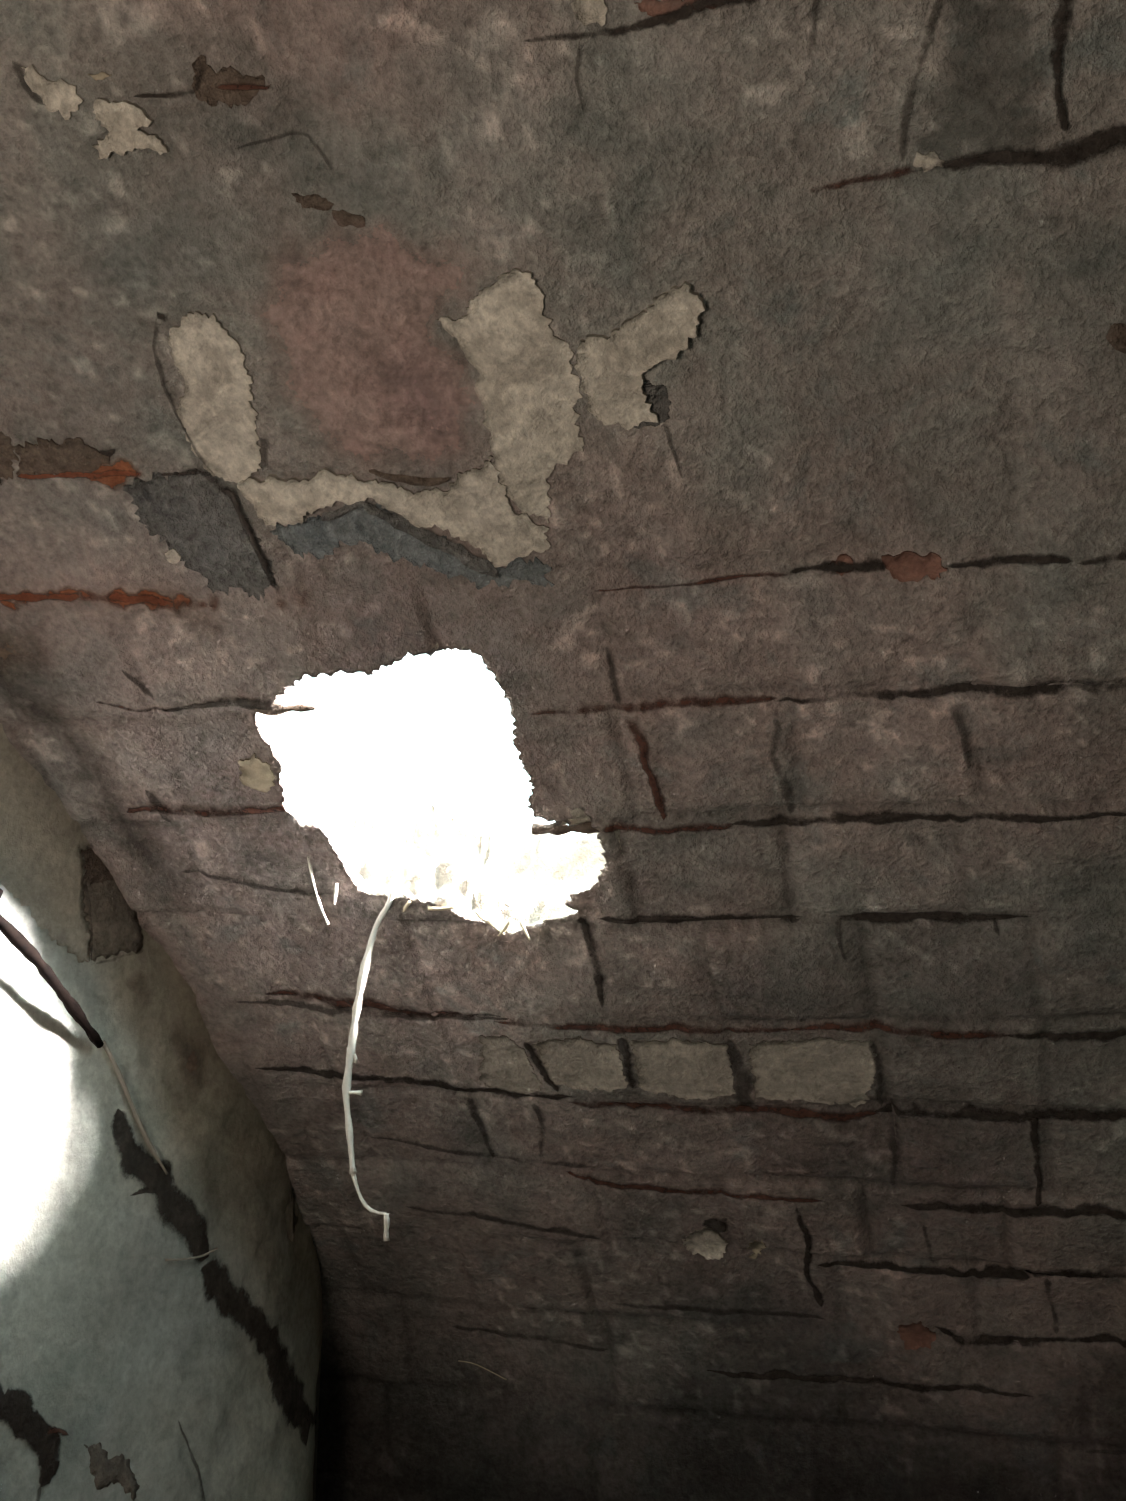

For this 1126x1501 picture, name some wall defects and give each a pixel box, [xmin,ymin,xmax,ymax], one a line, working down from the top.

flaking render [13,55,271,160]
water stain [269,233,462,486]
spalling [0,432,115,485]
rust [17,459,141,489]
flaking render [123,268,706,603]
rust [0,587,217,610]
spalling [85,1442,140,1501]